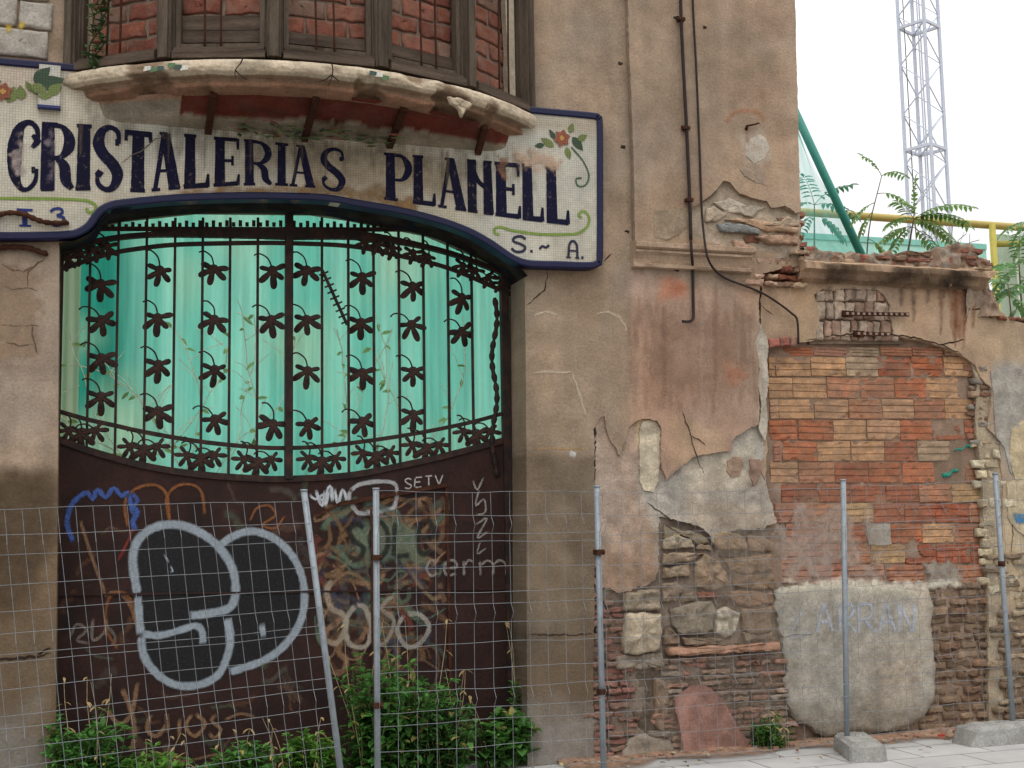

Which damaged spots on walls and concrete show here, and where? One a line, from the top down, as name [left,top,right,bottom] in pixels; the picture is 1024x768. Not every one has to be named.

spalling [692,182,800,259]
crack [3,260,43,291]
leakage [828,265,854,289]
leakage [880,269,971,289]
crack [4,325,37,353]
crack [682,412,705,473]
spalling [583,400,799,757]
crack [0,648,50,661]